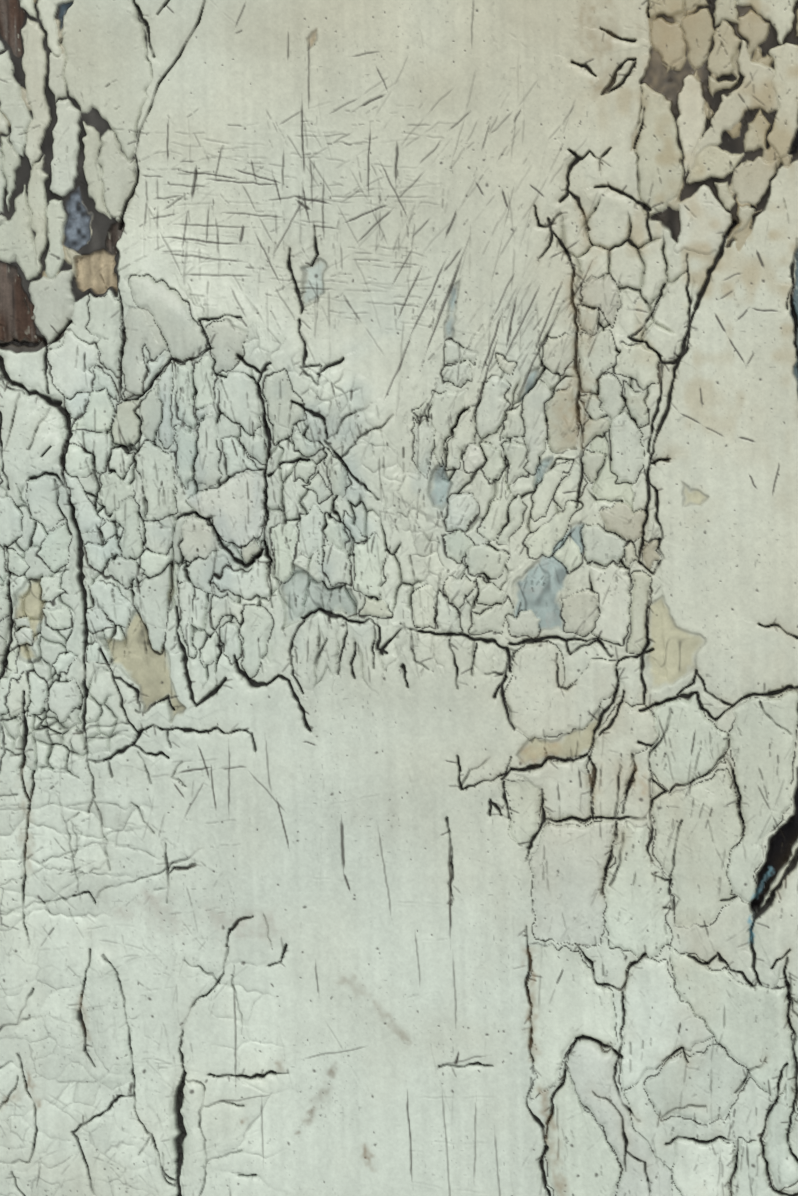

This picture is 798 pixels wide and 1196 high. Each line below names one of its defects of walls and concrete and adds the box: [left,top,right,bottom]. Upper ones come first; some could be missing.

crack [119,0,207,231]
crack [570,0,651,97]
crack [534,107,653,509]
peeling [0,0,798,950]
crack [0,220,798,939]
crack [0,988,39,1196]
peeling [0,943,179,1196]
crack [71,914,290,1196]
peeling [184,924,304,1196]
crack [439,1061,494,1069]
peeling [504,641,798,1196]
crack [525,848,798,1196]